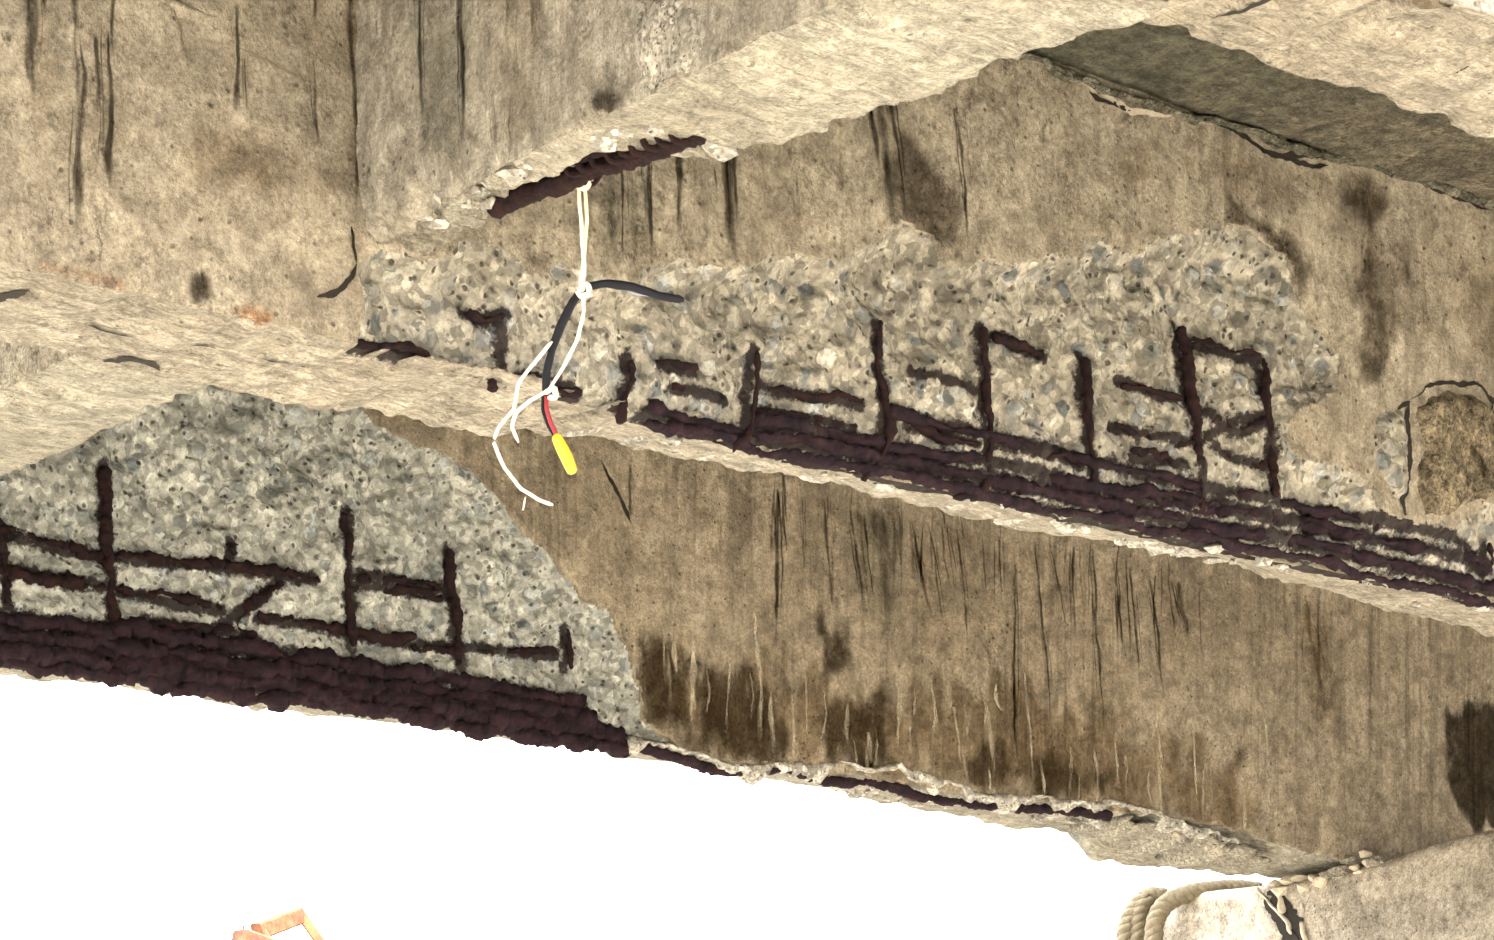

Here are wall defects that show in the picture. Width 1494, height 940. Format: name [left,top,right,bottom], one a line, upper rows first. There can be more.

damp [70,0,114,199]
damp [234,15,246,100]
crack [1210,0,1271,20]
spalling [0,290,30,302]
spalling [103,356,161,371]
spalling [343,125,1494,621]
spalling [0,385,1273,870]
damp [771,474,803,617]
damp [1035,548,1097,680]
damp [1114,546,1182,664]
damp [1446,703,1494,833]
crack [1255,886,1308,940]